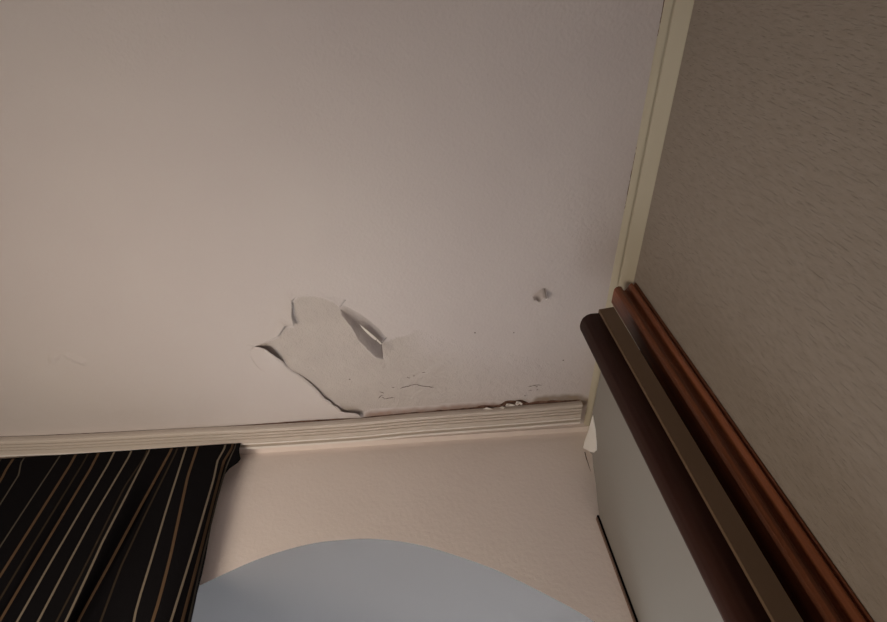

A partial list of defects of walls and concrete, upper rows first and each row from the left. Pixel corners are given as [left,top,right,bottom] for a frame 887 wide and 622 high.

peeling [247,288,581,418]